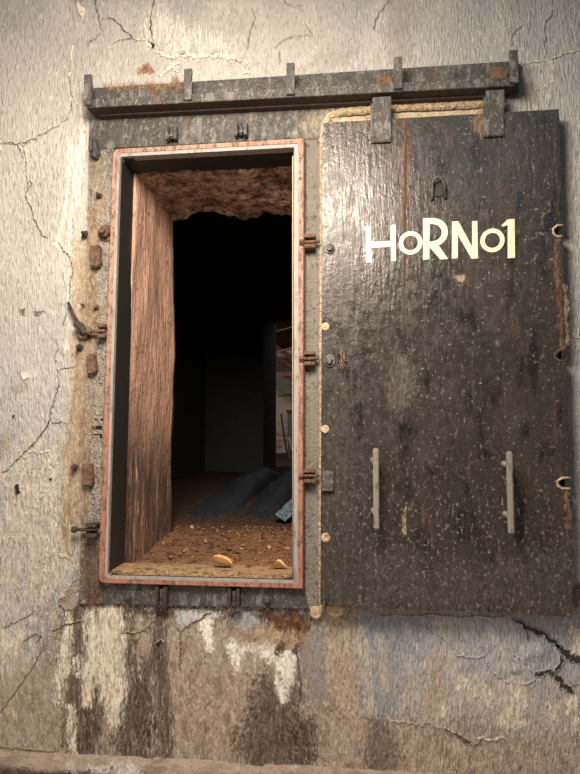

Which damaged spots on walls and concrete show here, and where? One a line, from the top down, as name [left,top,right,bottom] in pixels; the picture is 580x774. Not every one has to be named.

crack [75,0,156,47]
crack [246,8,257,48]
crack [273,0,313,62]
crack [372,0,390,34]
crack [510,25,523,45]
crack [521,8,580,78]
rust [102,62,184,96]
crack [0,79,78,473]
damp [0,370,580,774]
crack [0,609,84,712]
rust [233,608,312,657]
crack [380,613,580,694]